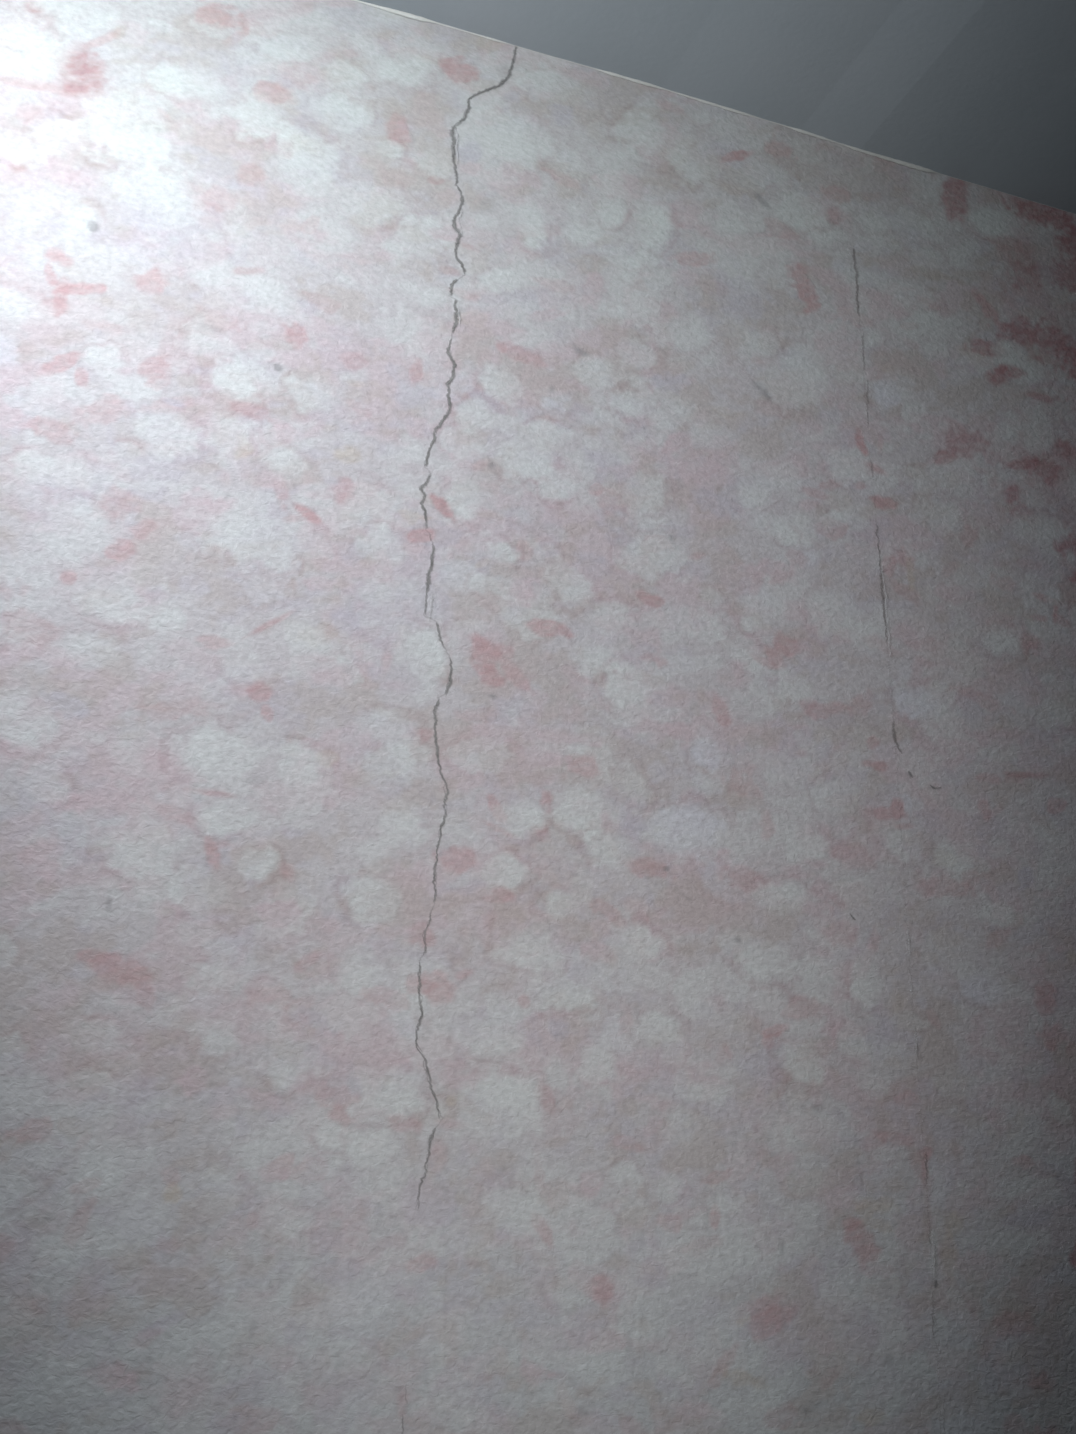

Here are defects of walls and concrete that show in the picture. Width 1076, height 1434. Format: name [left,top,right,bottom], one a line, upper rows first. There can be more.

crack [420,48,516,898]